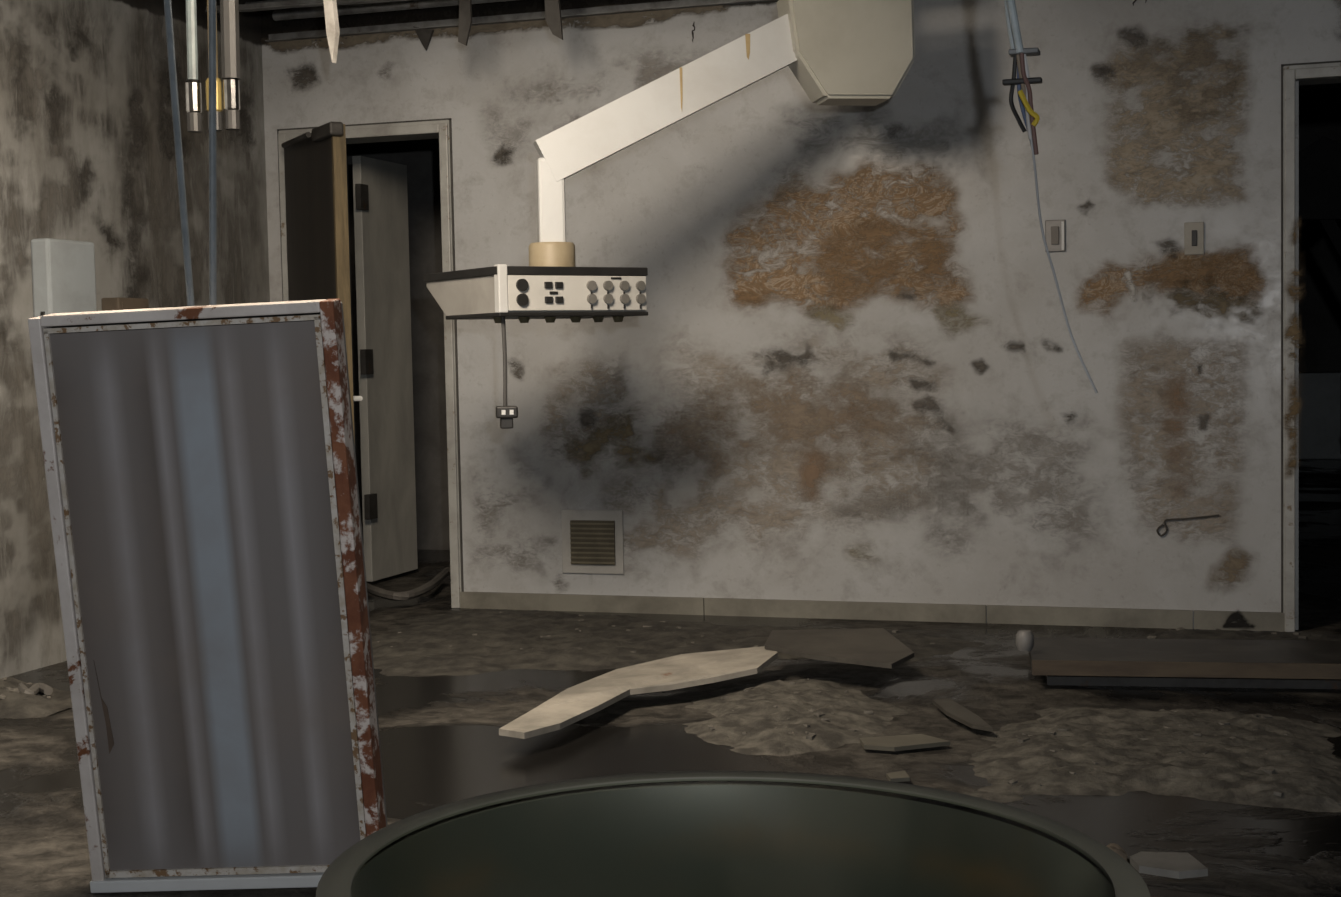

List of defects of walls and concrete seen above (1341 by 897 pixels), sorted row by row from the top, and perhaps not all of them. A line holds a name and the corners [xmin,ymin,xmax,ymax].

damp [0,16,258,308]
spalling [267,5,728,52]
damp [0,322,59,657]
damp [545,346,1087,553]